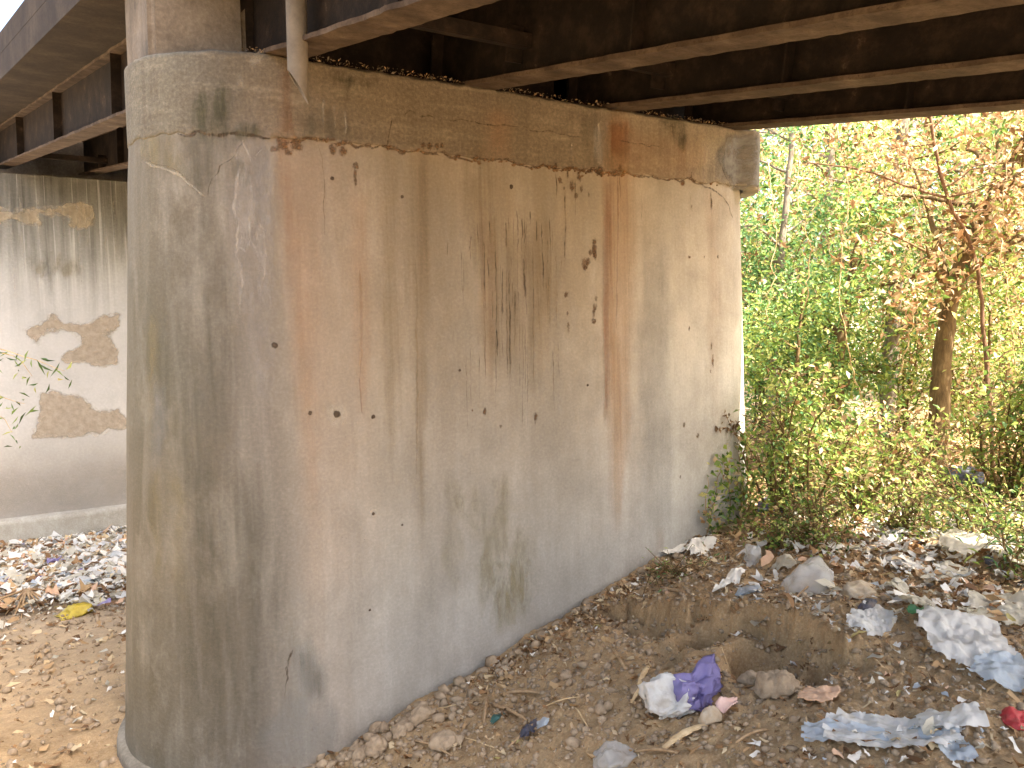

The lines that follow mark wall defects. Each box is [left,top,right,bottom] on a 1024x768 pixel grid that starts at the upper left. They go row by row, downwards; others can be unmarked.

crack [180,130,269,190]
crack [297,120,733,218]
peeling [0,202,95,229]
damp [466,254,527,365]
peeling [27,314,119,366]
peeling [32,391,126,439]